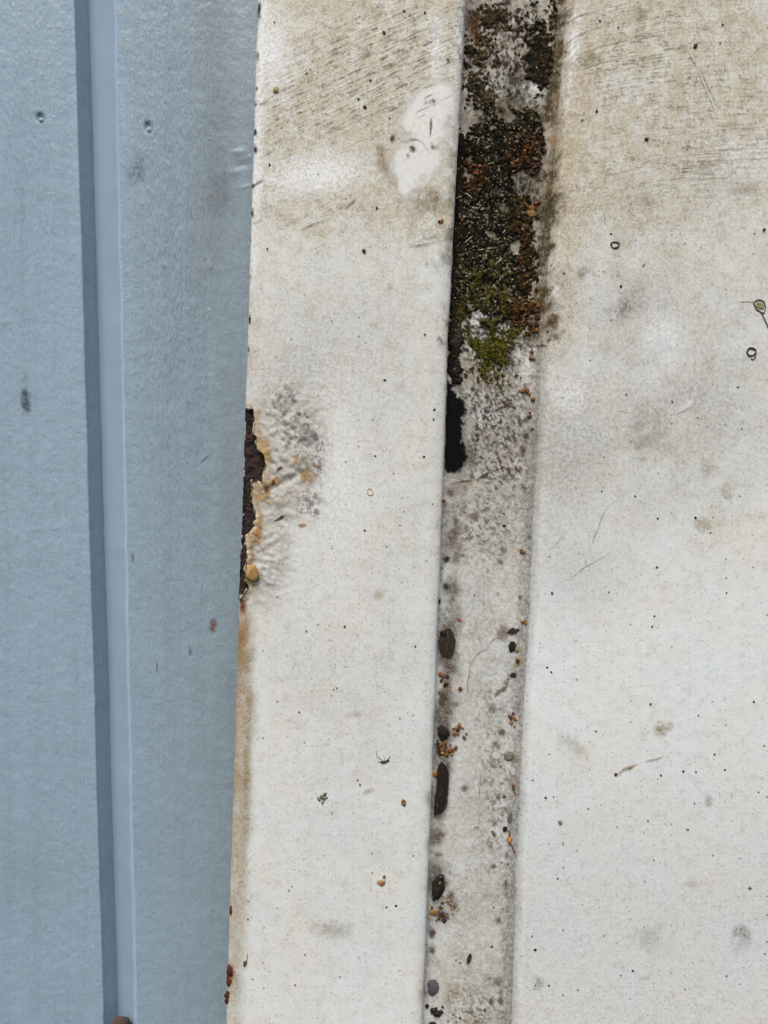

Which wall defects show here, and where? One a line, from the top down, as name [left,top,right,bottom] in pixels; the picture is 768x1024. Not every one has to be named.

leakage [444,0,559,472]
corrosion [224,964,233,1005]